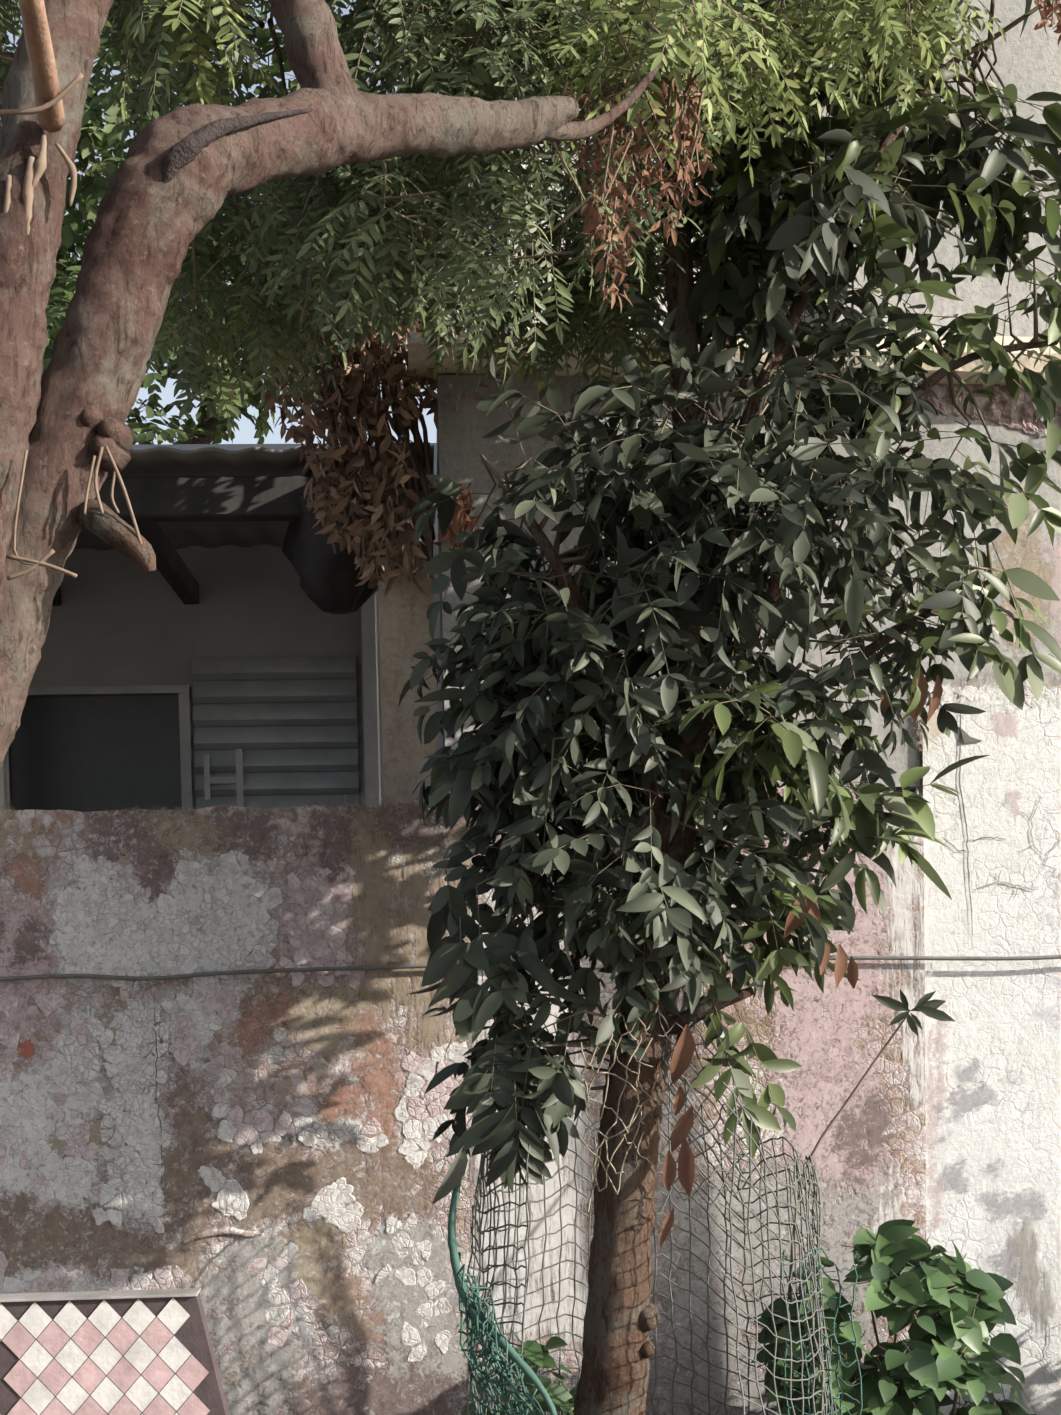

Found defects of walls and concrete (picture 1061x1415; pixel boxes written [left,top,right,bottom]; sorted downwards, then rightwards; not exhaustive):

spalling [911,382,1061,439]
peeling [0,838,494,1234]
peeling [516,960,586,1073]
peeling [0,1252,190,1294]
peeling [465,1110,599,1354]